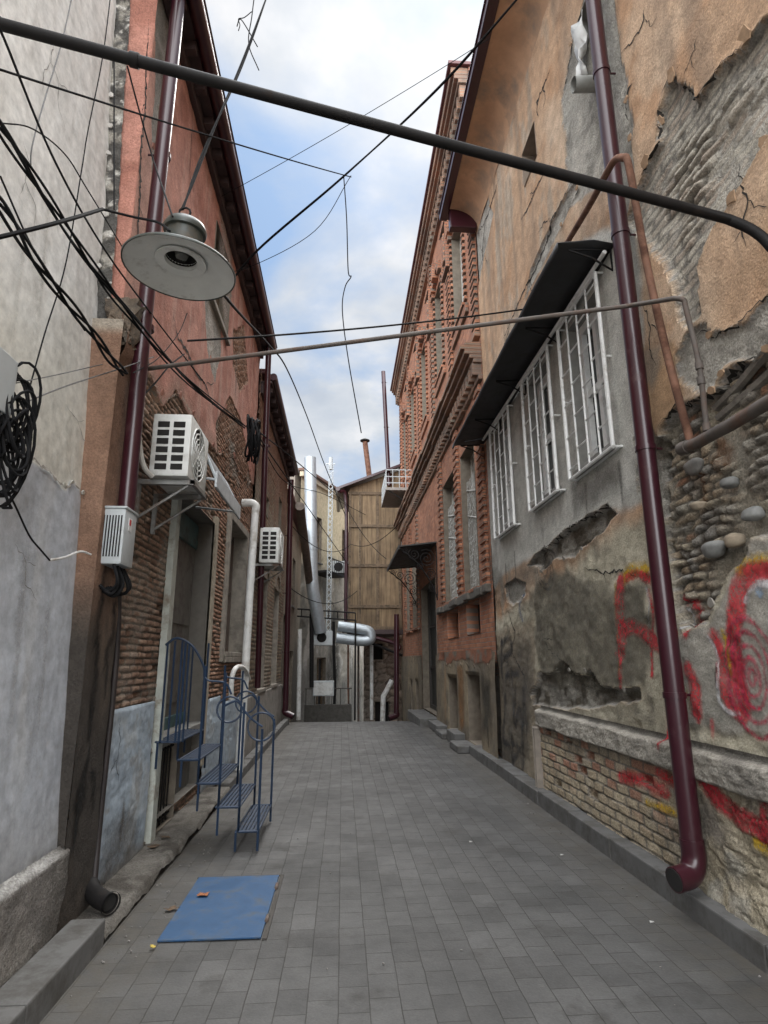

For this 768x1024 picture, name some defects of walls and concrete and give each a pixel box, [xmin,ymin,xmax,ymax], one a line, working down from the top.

crack [621,11,654,120]
flaking render [524,35,604,299]
crack [734,164,767,249]
flaking render [601,0,768,633]
flaking render [527,503,619,573]
flaking render [530,662,642,711]